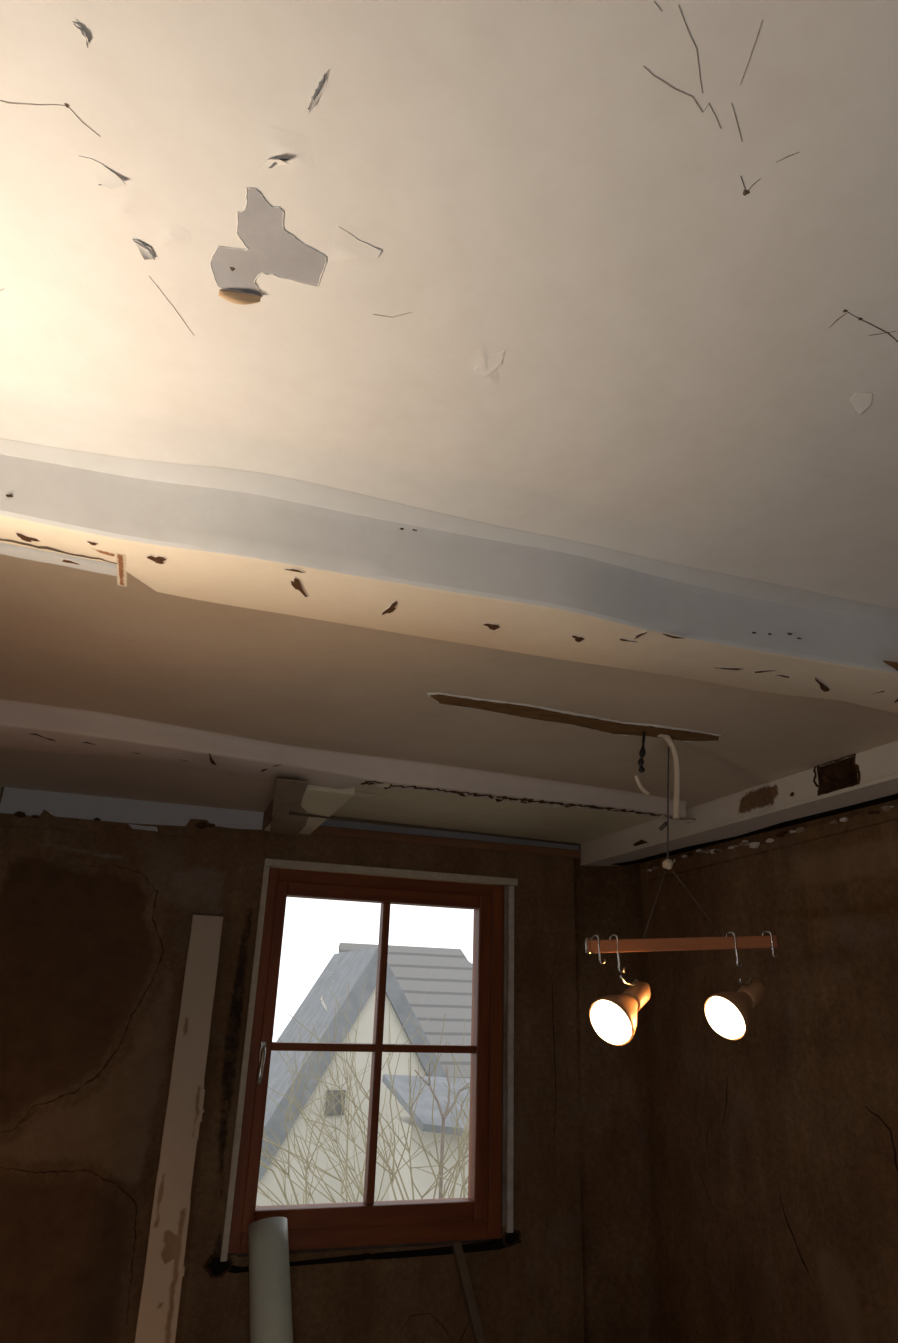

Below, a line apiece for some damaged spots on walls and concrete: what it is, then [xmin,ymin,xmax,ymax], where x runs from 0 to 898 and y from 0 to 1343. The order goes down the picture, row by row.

crack [644,2,762,141]
crack [0,100,98,135]
crack [740,152,799,196]
peeling [210,187,327,305]
crack [829,309,898,342]
flaking render [15,532,41,542]
flaking render [284,568,308,597]
flaking render [381,600,398,615]
flaking render [427,692,722,742]
flaking render [736,781,794,816]
flaking render [647,803,898,880]
leakage [206,903,259,1275]